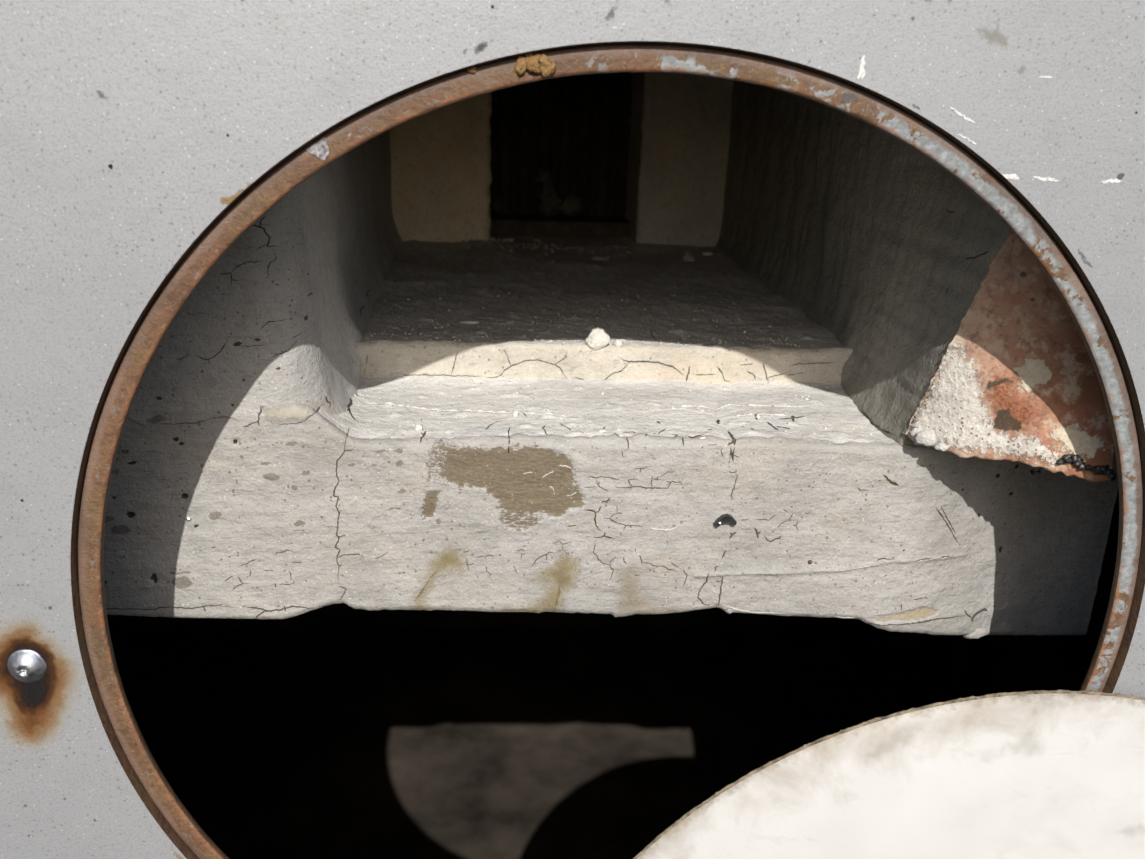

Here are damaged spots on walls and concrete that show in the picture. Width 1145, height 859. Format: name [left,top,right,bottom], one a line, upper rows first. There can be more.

crack [151,215,312,364]
crack [398,330,835,382]
corrosion [983,366,1044,432]
crack [162,396,387,599]
crack [464,413,808,606]
crack [106,550,310,618]
leakage [417,552,461,609]
leakage [521,557,575,611]
corrosion [0,625,71,743]